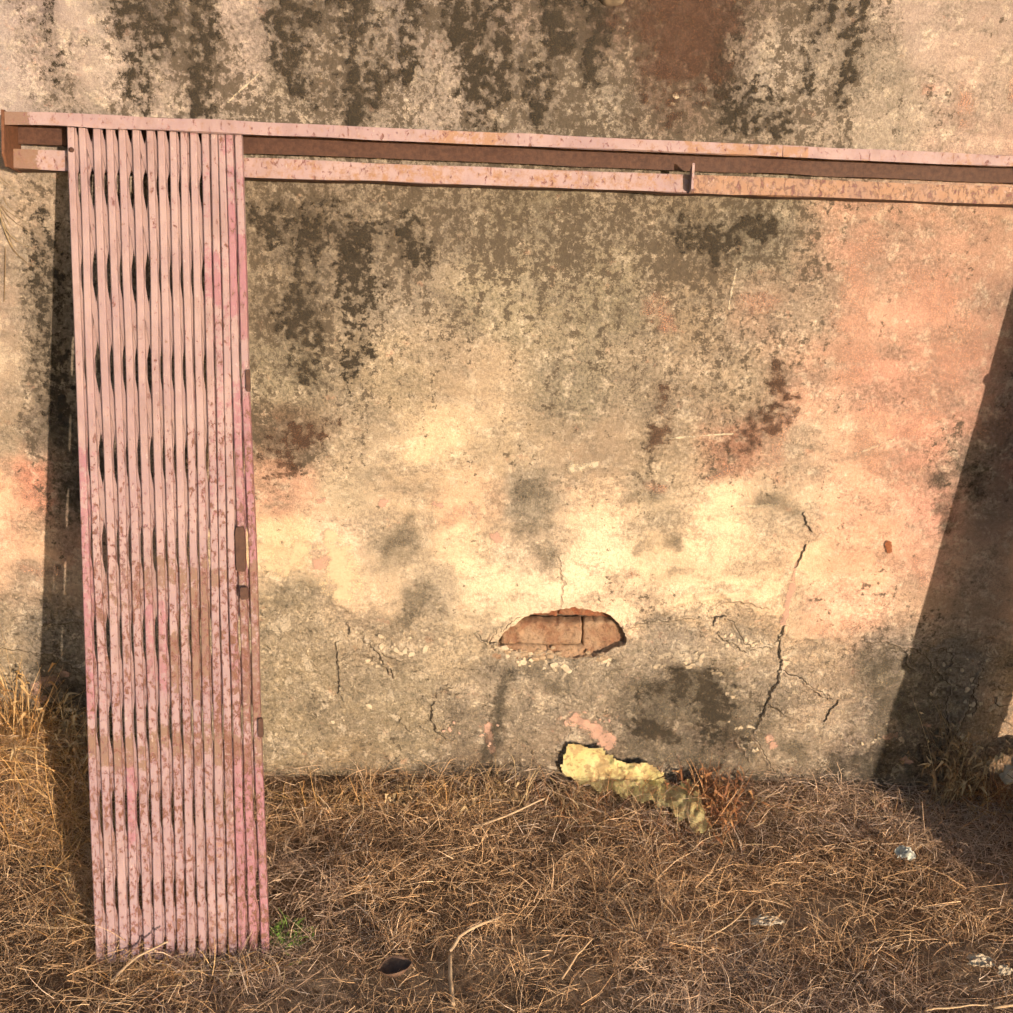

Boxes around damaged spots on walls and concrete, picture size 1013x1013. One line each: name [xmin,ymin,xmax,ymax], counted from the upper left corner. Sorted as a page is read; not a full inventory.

leakage [109,0,223,119]
leakage [258,0,426,126]
leakage [438,0,796,143]
leakage [799,0,873,109]
leakage [23,208,80,503]
leakage [246,196,435,397]
leakage [644,357,803,456]
crack [795,513,815,569]
crack [336,622,408,701]
crack [400,683,456,741]
spalling [492,607,627,674]
crack [623,598,881,786]